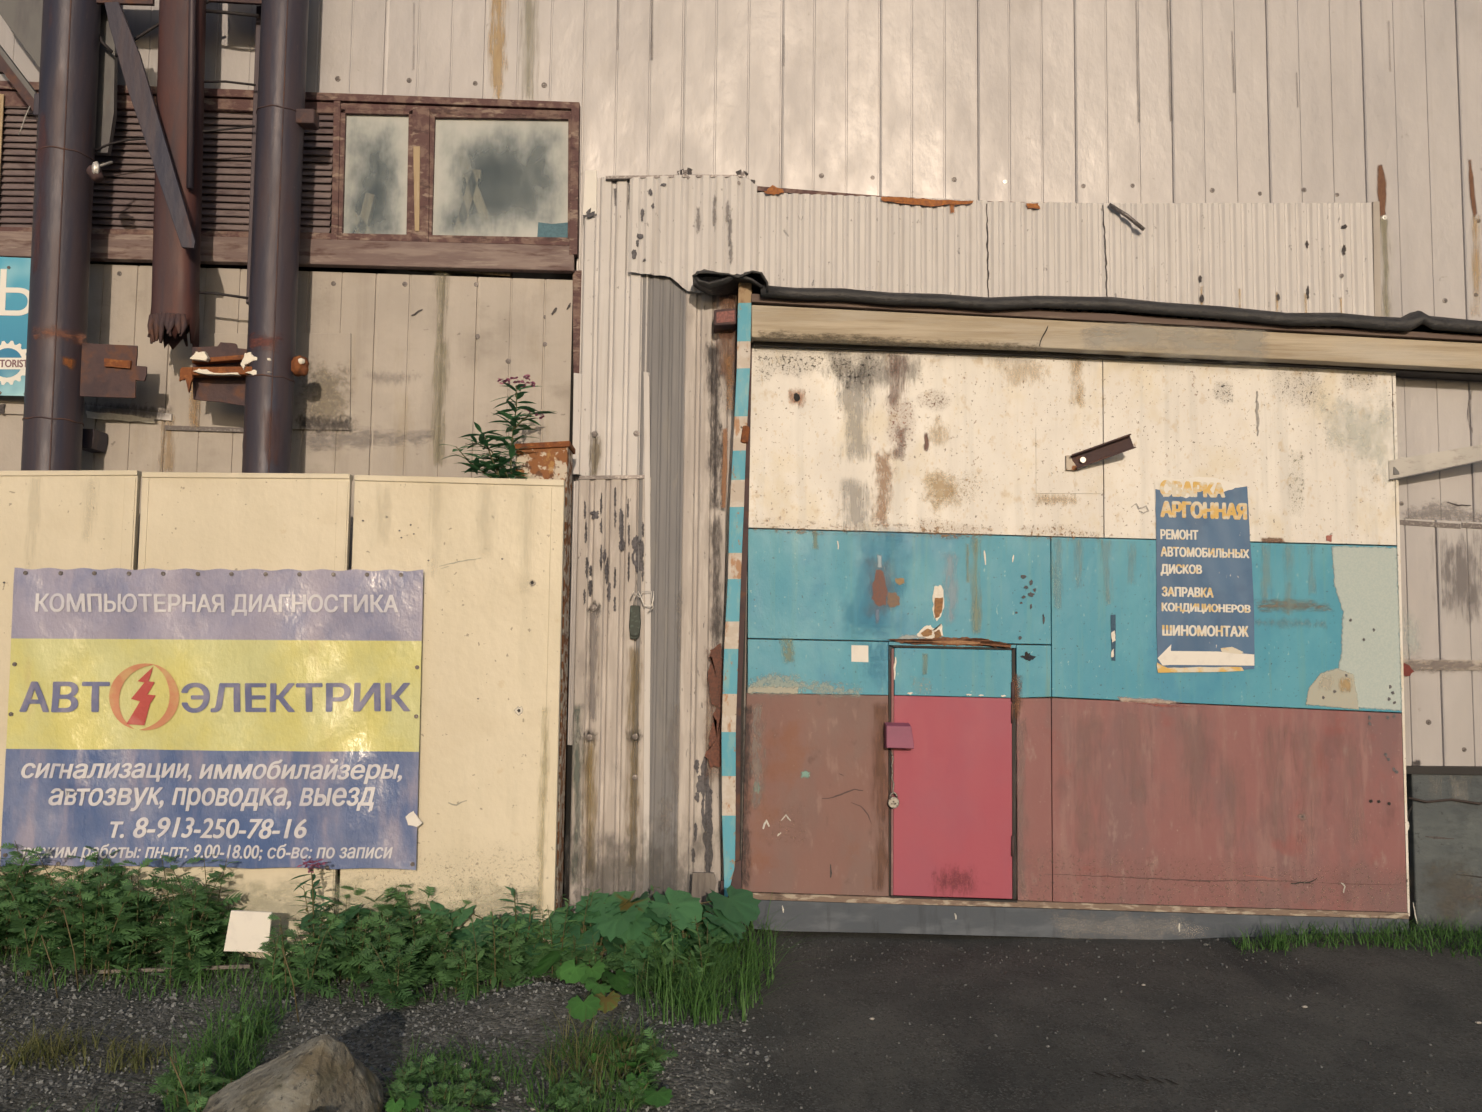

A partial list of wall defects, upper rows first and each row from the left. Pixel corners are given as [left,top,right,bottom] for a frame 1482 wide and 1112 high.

corrosion [490,0,505,99]
corrosion [881,197,973,213]
corrosion [1377,165,1388,315]
corrosion [1469,160,1478,288]
corrosion [104,358,132,369]
leakage [433,275,446,460]
peeling [899,585,944,639]
peeling [1306,669,1396,726]